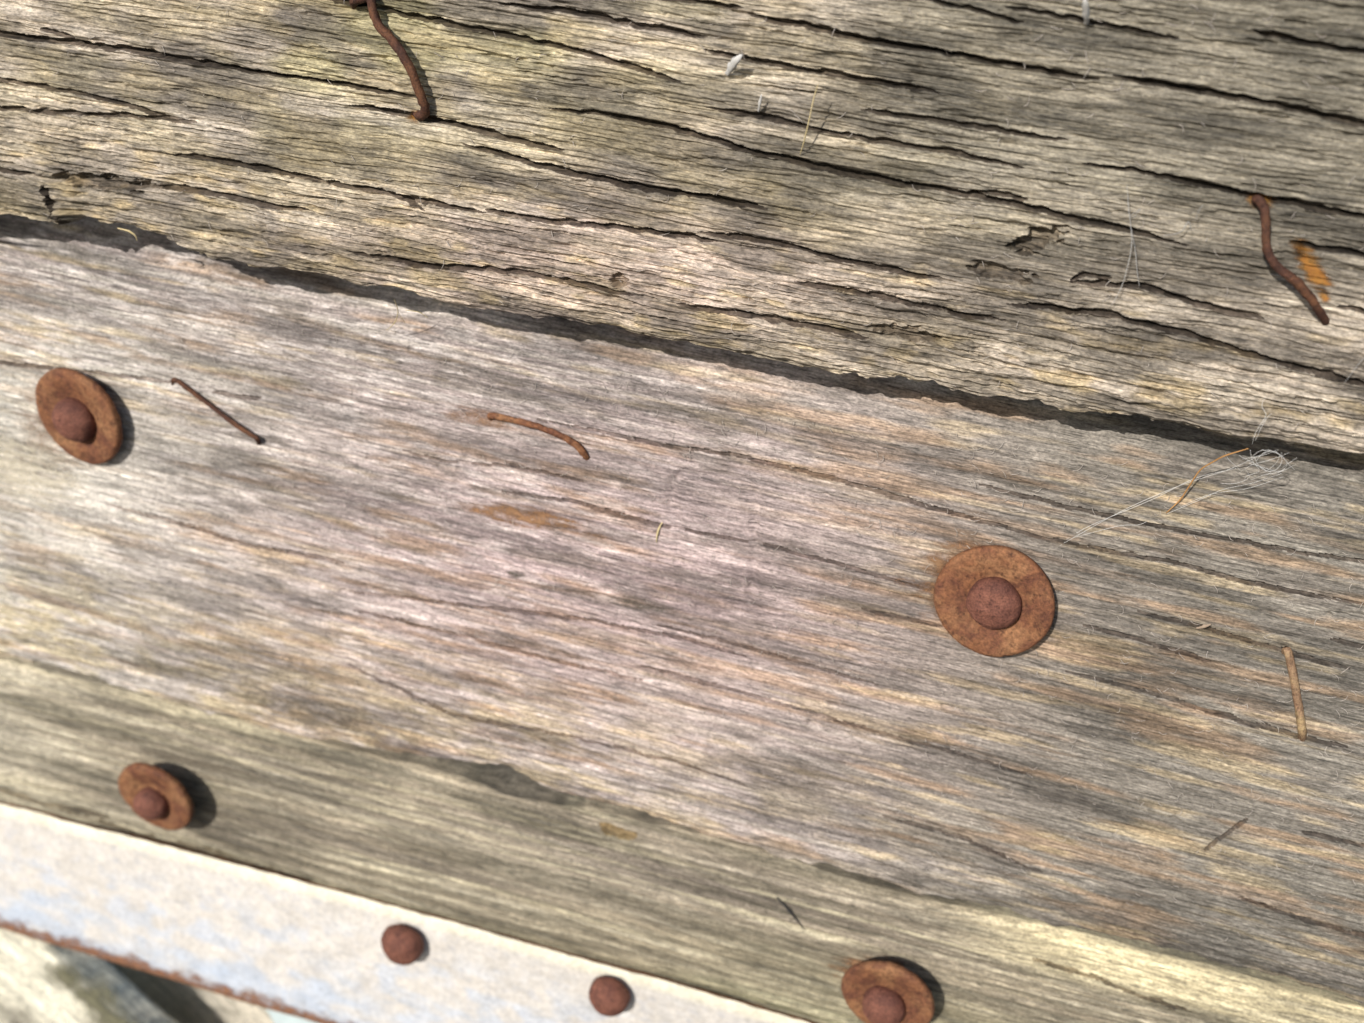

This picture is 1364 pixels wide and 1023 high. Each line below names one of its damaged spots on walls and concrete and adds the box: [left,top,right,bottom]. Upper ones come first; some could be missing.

crack [0,0,1364,386]
corrosion [1296,246,1332,301]
crack [105,502,1032,787]
crack [1065,670,1348,748]
crack [0,787,311,881]
crack [882,815,1043,873]
crack [1204,817,1248,852]
crack [1302,830,1364,848]
crack [1238,896,1364,938]
corrosion [0,921,336,1023]
crack [1032,957,1192,1012]